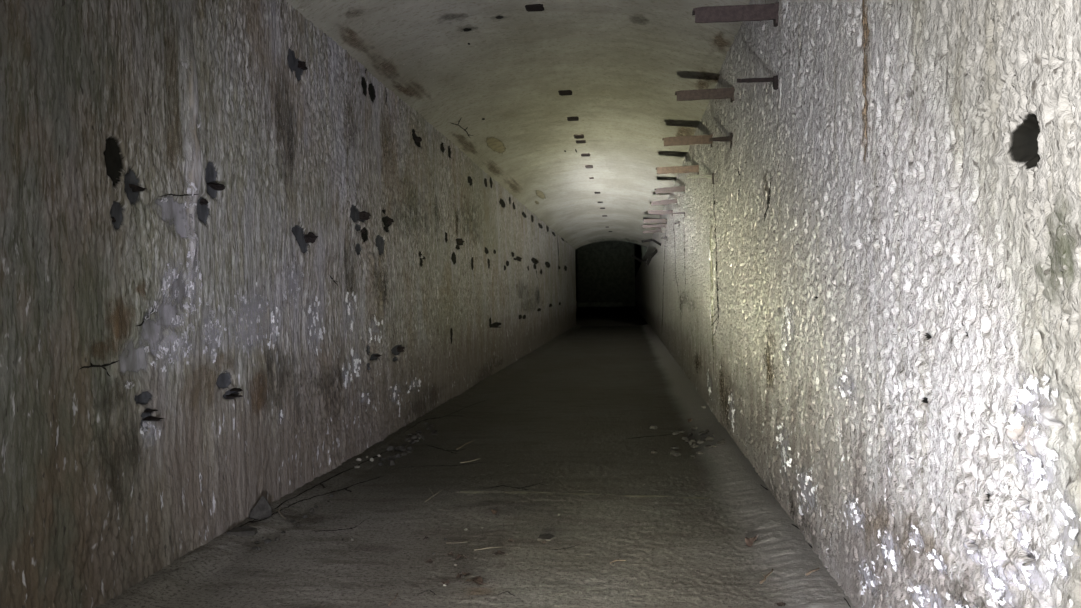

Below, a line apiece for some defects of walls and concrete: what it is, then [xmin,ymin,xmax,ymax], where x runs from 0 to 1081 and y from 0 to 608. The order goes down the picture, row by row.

rust [861,0,870,162]
spalling [1009,113,1040,169]
spalling [103,137,147,230]
flaking render [155,162,225,238]
spalling [292,225,318,254]
spalling [350,204,394,255]
crack [80,361,118,376]
flaking render [119,272,197,432]
leakage [144,233,325,406]
leakage [1002,374,1058,430]
leakage [965,440,1081,607]
leakage [905,584,969,608]